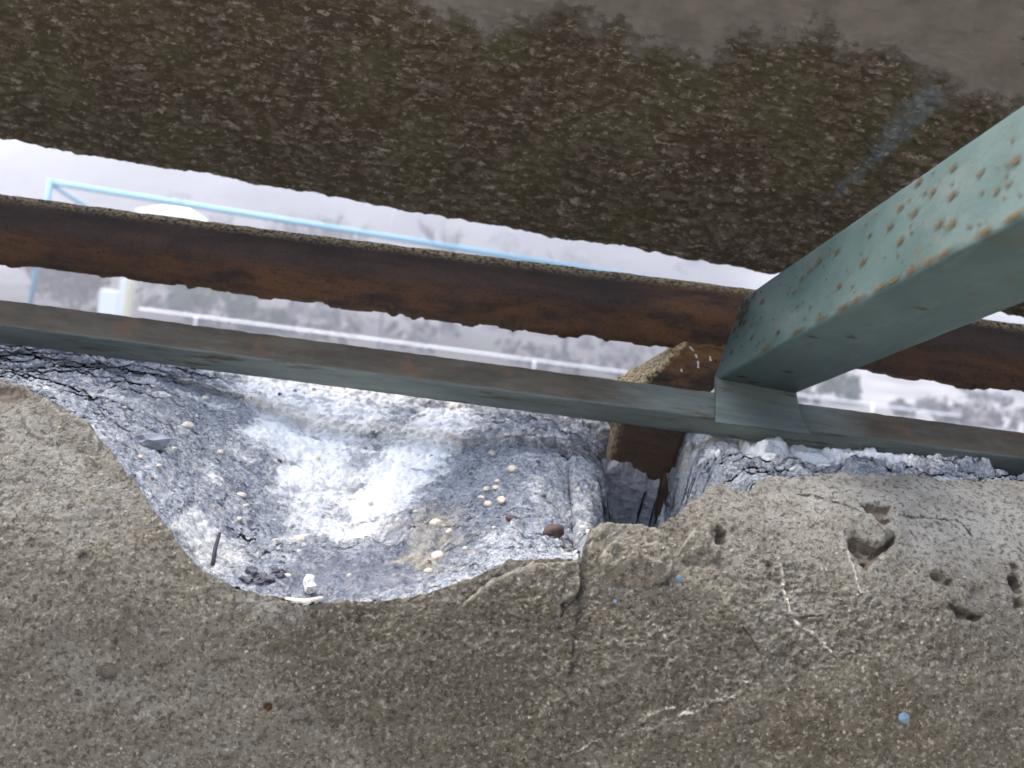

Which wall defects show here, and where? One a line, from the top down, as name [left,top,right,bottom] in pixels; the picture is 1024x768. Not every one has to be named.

rust [780,199,950,338]
spalling [0,343,1024,624]